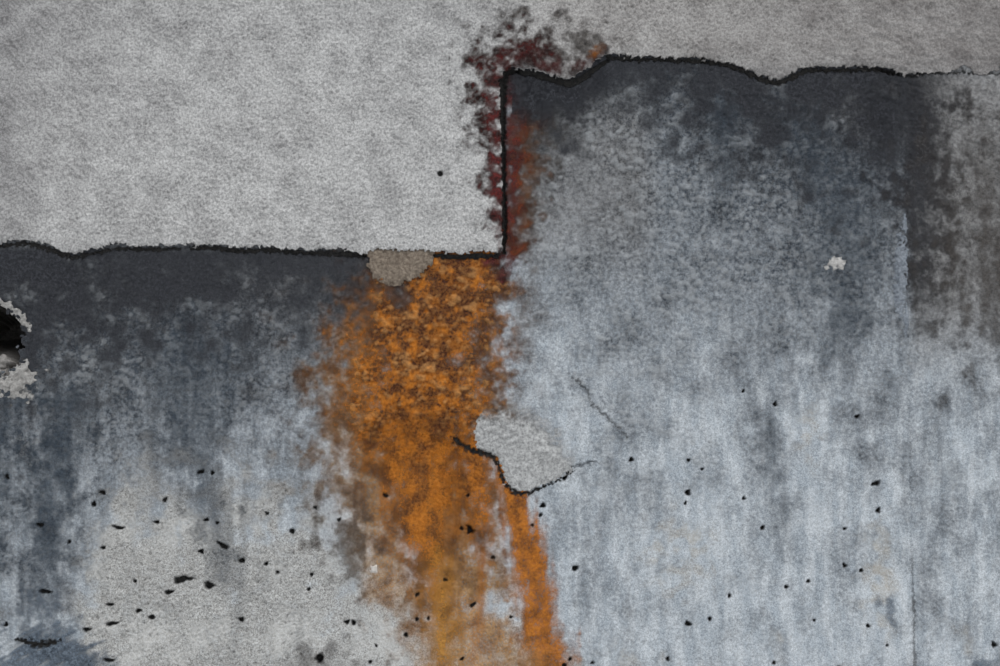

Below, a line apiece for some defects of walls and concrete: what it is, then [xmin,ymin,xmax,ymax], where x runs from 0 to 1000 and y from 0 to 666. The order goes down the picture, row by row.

water stain [506,53,965,291]
spalling [0,298,49,407]
water stain [0,248,370,390]
peeling [364,248,435,286]
corrosion [324,6,606,666]
spalling [824,256,846,271]
spalling [892,212,909,338]
peeling [0,621,114,666]